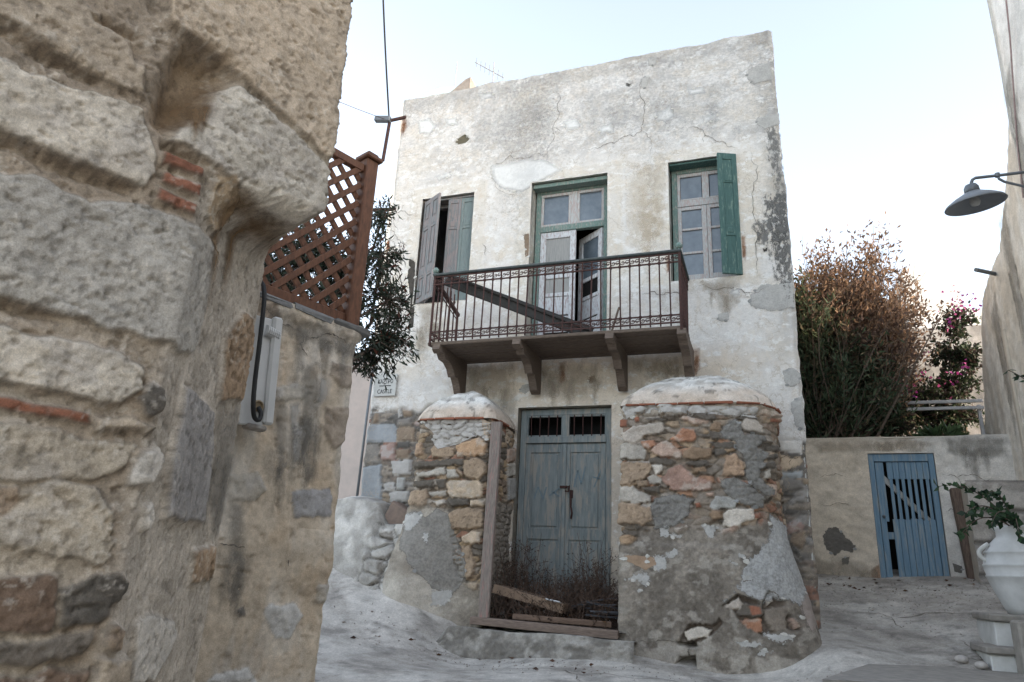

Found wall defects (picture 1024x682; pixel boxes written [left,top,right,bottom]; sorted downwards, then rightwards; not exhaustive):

flaking render [745,62,773,84]
crack [597,70,652,154]
crack [491,91,561,196]
flaking render [748,282,795,311]
flaking render [420,419,491,449]
flaking render [622,404,758,435]
flaking render [619,526,682,593]
peeling [701,523,720,538]
flaking render [823,527,857,565]